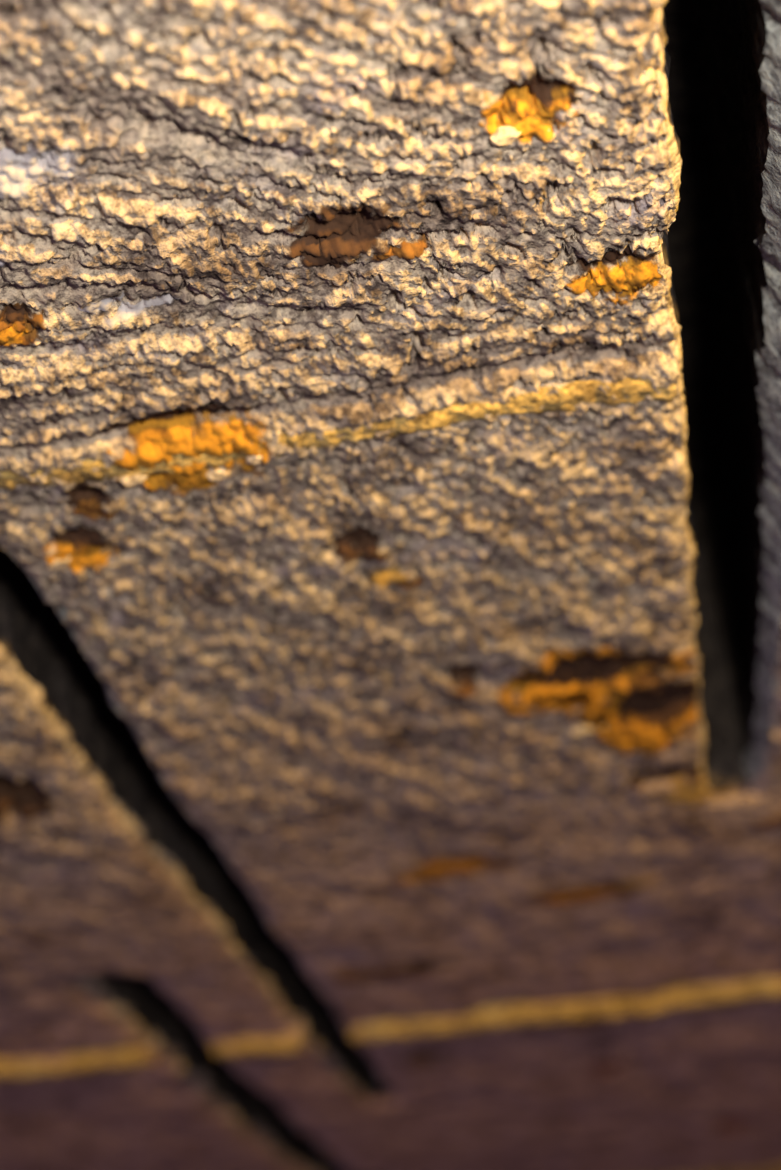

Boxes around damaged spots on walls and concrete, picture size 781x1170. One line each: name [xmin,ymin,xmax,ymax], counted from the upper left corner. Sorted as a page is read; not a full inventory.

corrosion [497,646,700,755]
corrosion [617,764,735,805]